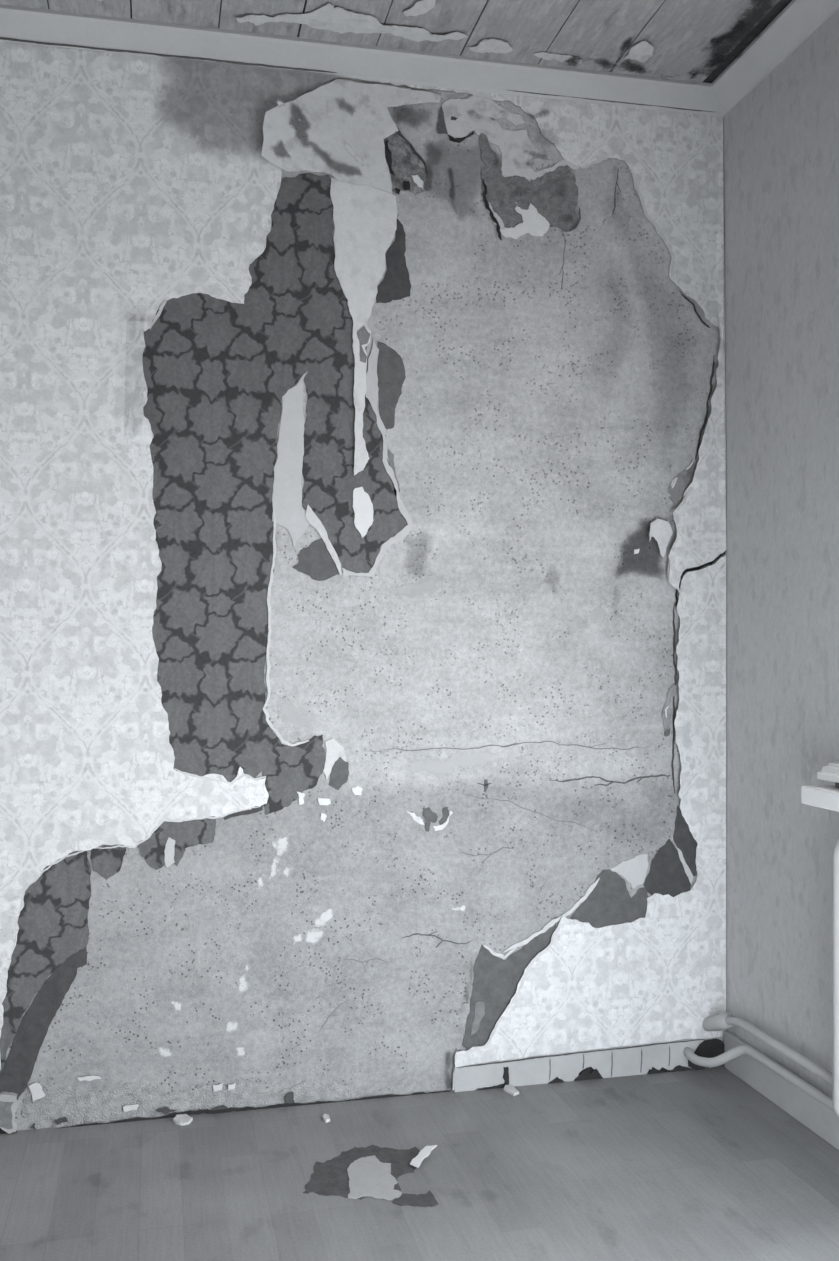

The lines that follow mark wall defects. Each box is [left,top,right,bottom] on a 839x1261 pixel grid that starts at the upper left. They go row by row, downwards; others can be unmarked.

peeling [236,0,513,54]
peeling [532,52,583,65]
water stain [596,38,646,73]
peeling [623,40,654,63]
water stain [690,0,783,76]
water stain [396,108,422,126]
crack [675,551,725,606]
peeling [14,78,717,1131]
crack [371,741,671,786]